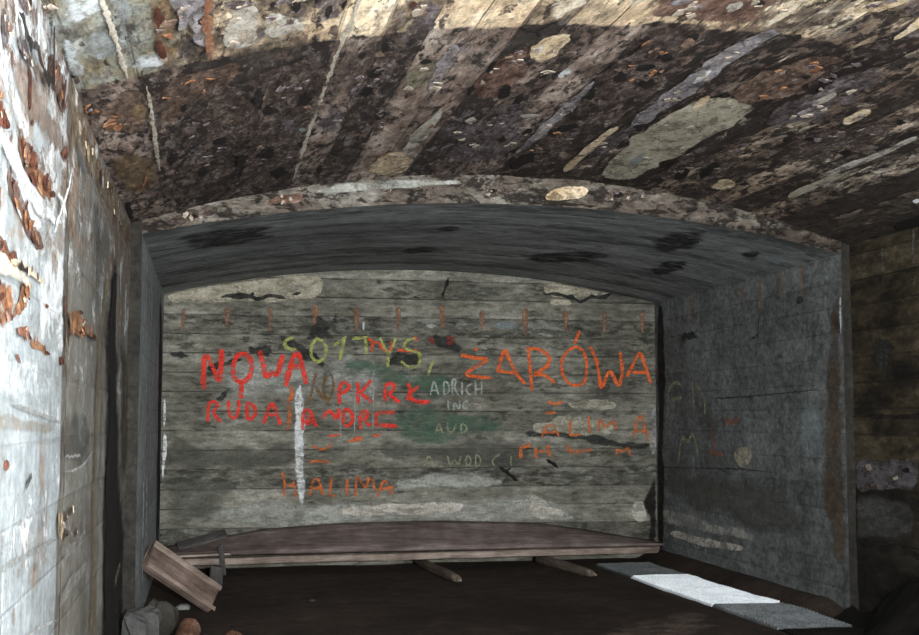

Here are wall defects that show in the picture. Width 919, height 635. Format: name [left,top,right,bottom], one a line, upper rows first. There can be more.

spalling [0,91,10,129]
crack [19,12,55,87]
spalling [84,91,147,133]
spalling [160,59,352,188]
peeling [222,0,347,49]
spalling [348,40,403,100]
peeling [367,0,919,204]
spalling [19,136,56,201]
spalling [0,172,44,250]
spalling [0,259,65,366]
spalling [69,310,96,341]
water stain [61,223,127,635]